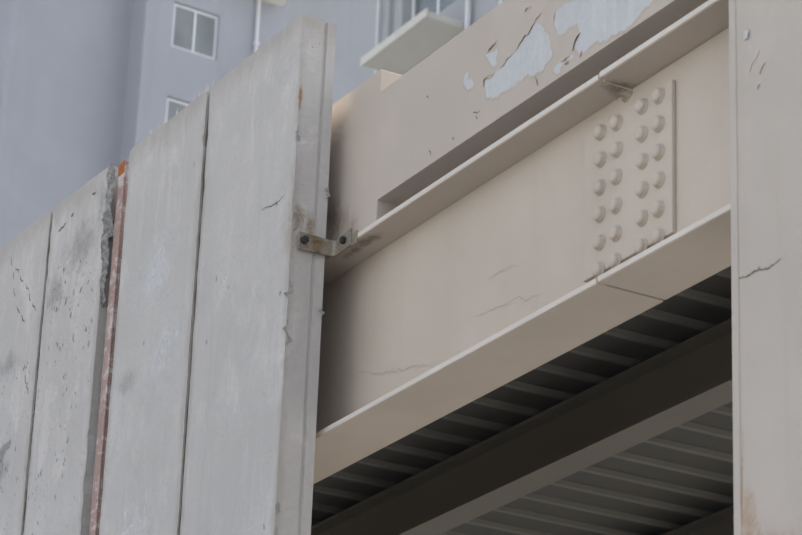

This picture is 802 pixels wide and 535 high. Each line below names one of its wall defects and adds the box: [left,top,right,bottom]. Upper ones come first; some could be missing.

peeling [462,0,656,101]
crack [11,257,35,322]
crack [739,259,780,279]